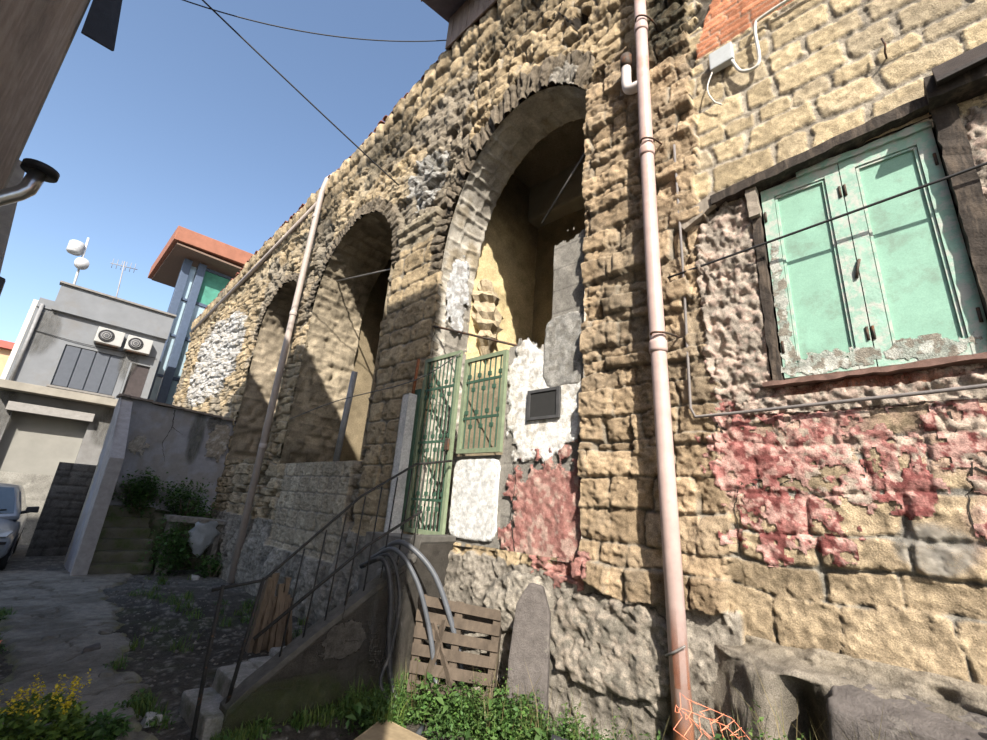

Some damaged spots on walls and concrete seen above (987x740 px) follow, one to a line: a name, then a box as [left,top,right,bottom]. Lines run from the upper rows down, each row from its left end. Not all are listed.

flaking render [965,95,987,200]
peeling [498,338,591,591]
flaking render [695,200,987,567]
crack [967,458,987,546]